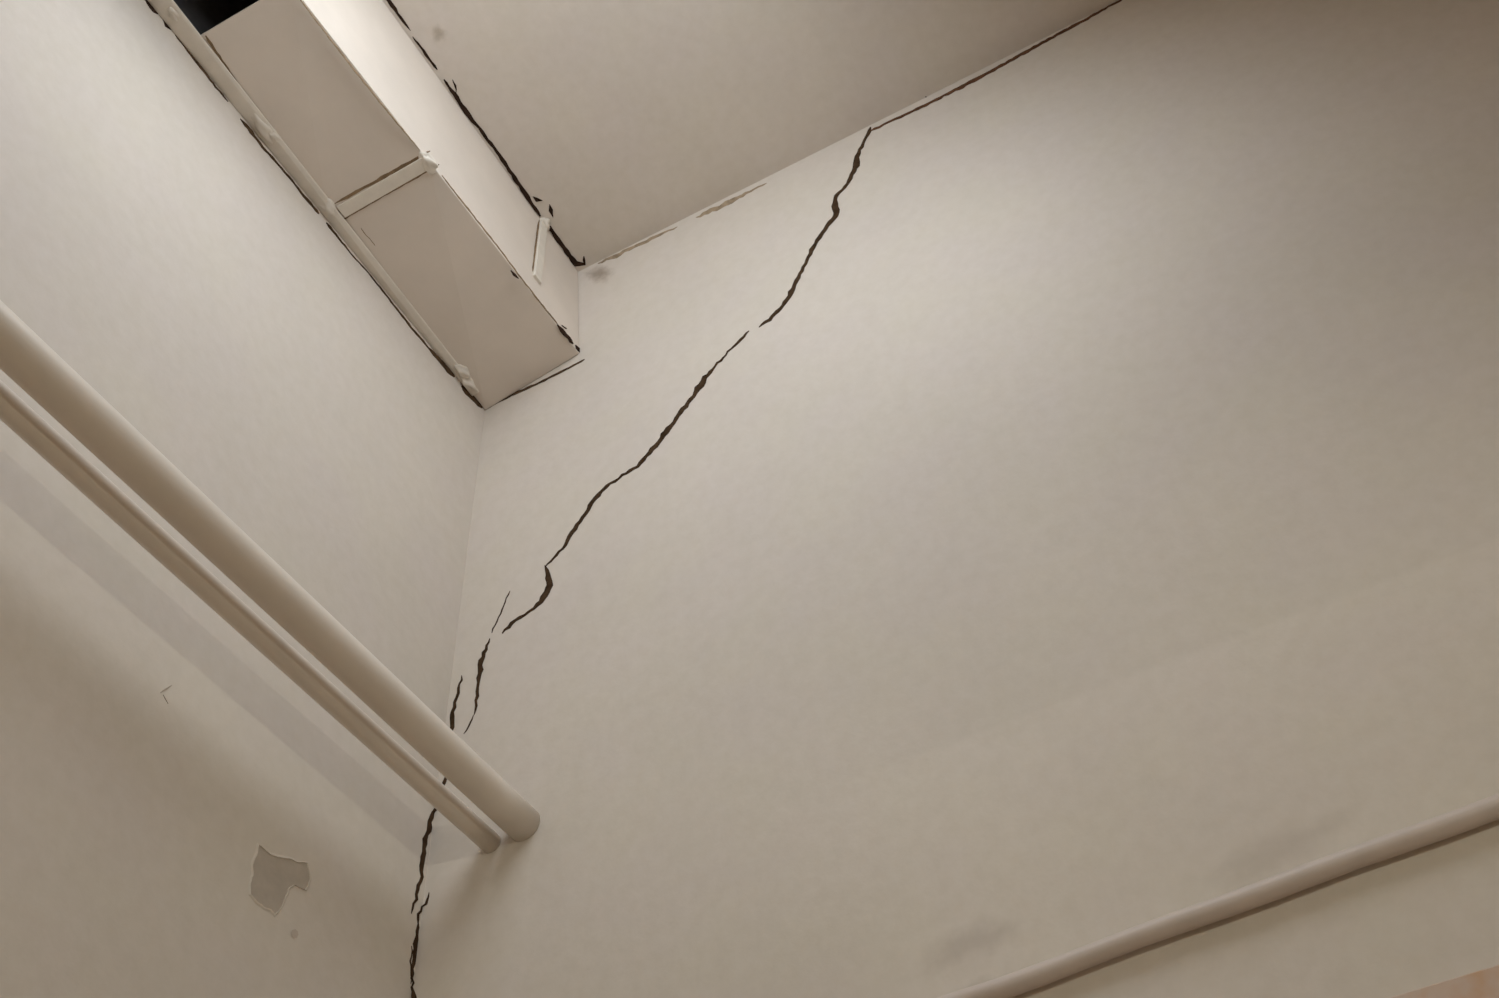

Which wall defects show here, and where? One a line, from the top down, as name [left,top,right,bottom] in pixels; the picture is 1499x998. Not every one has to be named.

crack [450,0,1122,733]
peeling [248,843,312,917]
crack [410,777,447,998]